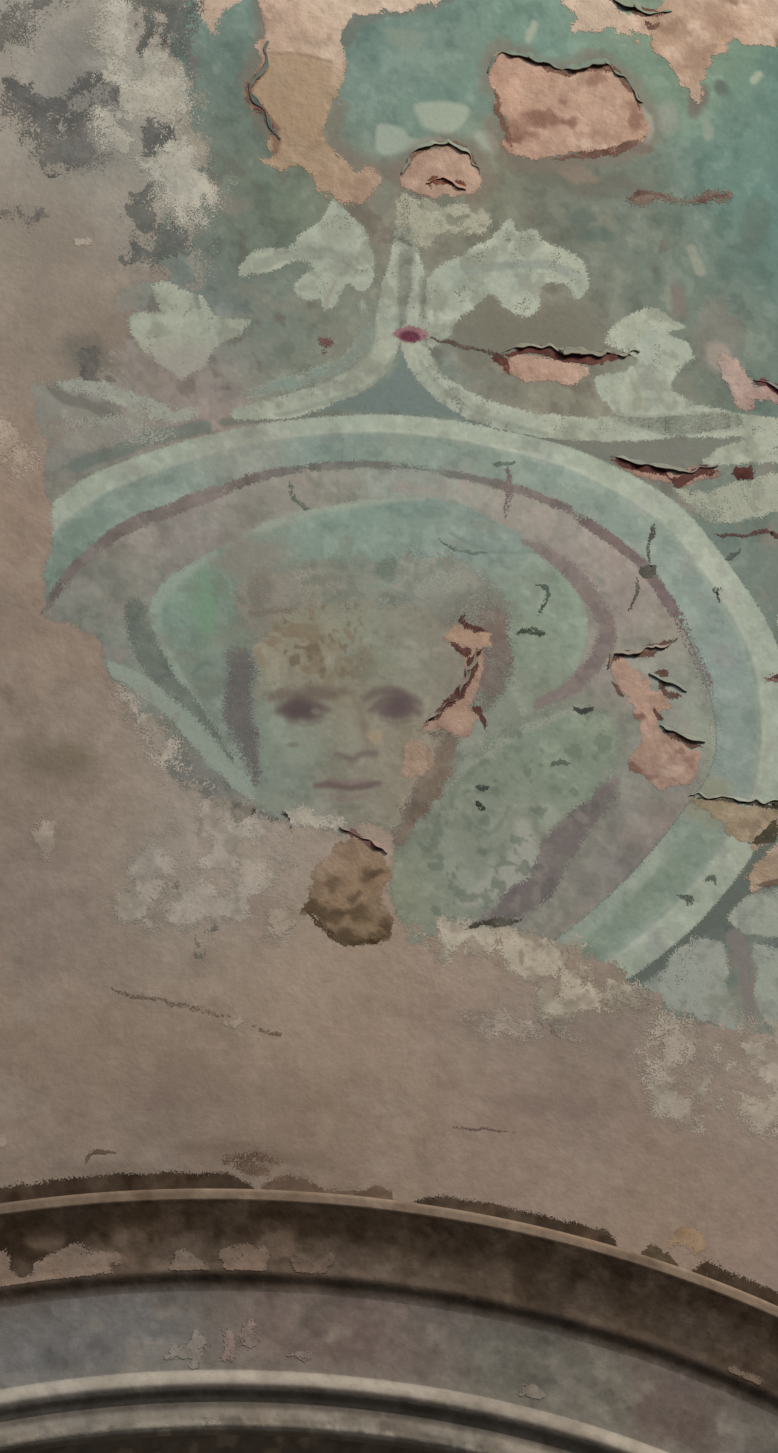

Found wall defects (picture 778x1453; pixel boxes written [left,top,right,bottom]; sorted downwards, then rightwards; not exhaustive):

damp [0,0,241,276]
peeling [242,0,485,207]
peeling [487,50,650,161]
peeling [561,0,778,104]
peeling [488,343,640,386]
peeling [398,591,522,779]
peeling [606,636,778,894]
damp [412,914,778,1165]
peeling [0,1242,122,1287]
damp [0,1150,393,1203]
damp [411,1194,617,1247]
damp [641,1244,778,1306]